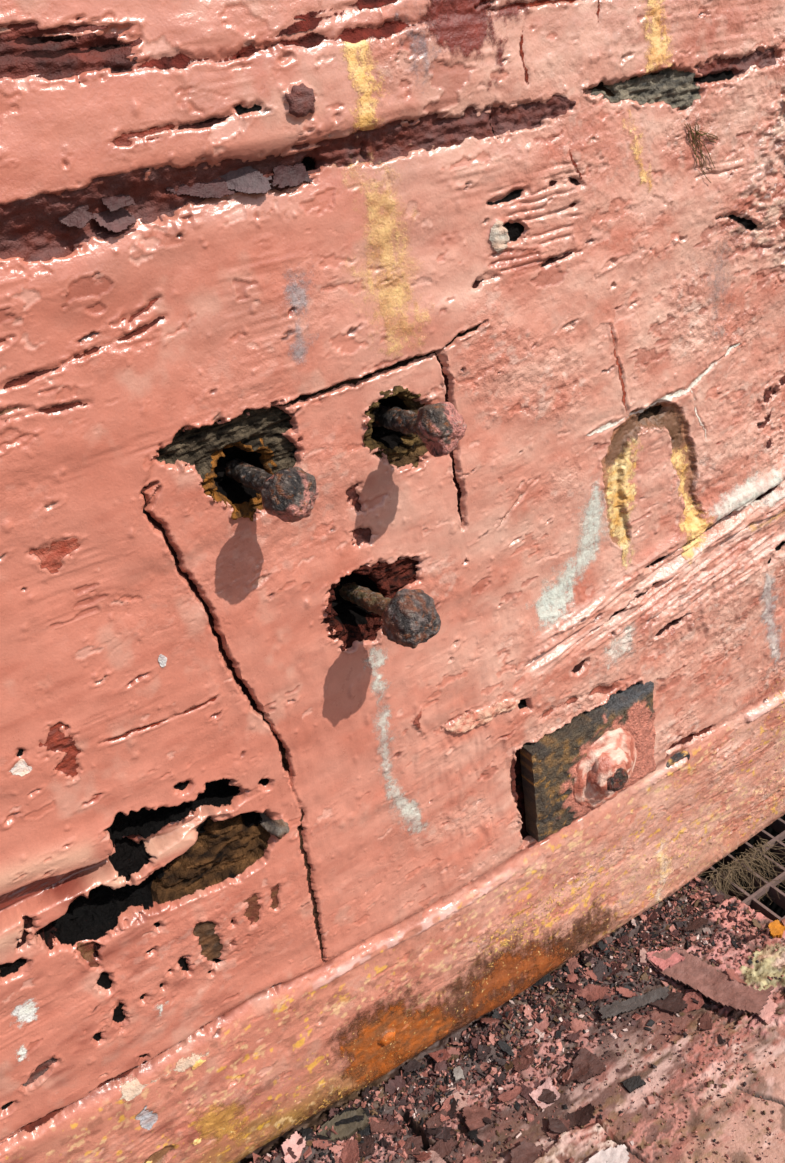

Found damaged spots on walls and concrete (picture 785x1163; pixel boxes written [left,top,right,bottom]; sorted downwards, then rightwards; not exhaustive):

peeling [0,17,143,83]
peeling [0,48,777,262]
crack [276,323,481,406]
crack [449,450,462,522]
crack [106,483,290,772]
spalling [241,811,262,828]
spalling [109,837,153,881]
peeling [244,885,279,925]
crack [297,809,324,958]
peeling [76,941,101,967]
peeling [193,922,223,961]
rust [280,902,617,1136]